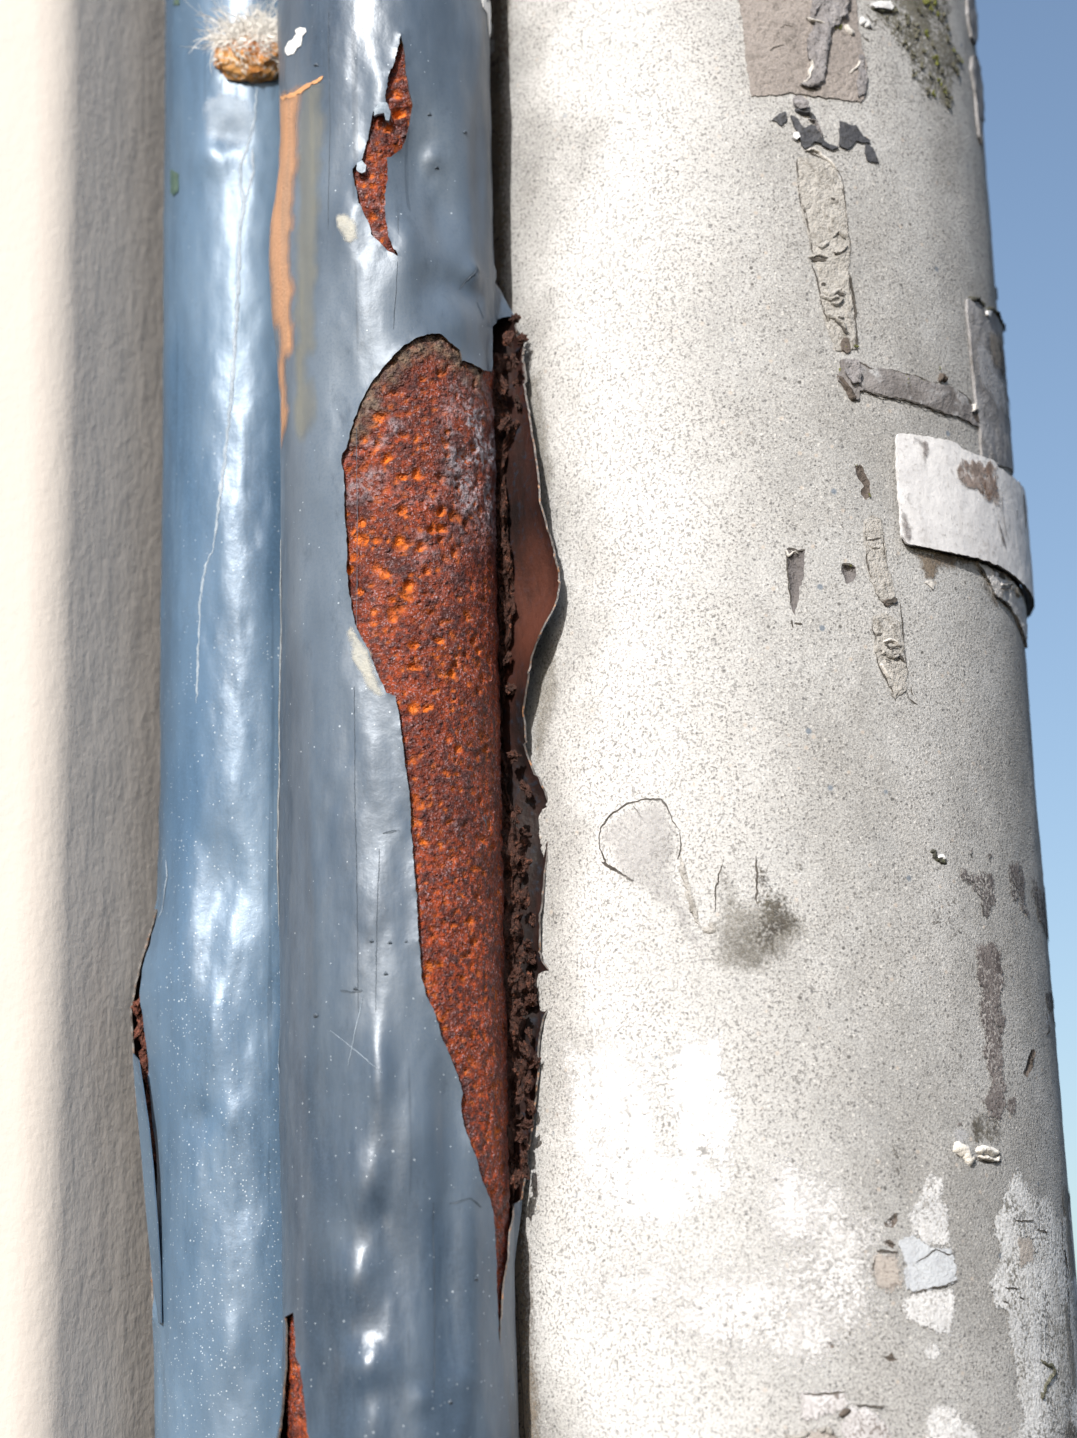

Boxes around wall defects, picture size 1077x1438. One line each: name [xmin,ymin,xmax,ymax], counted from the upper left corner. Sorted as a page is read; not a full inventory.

peeling [738,0,1014,477]
rust [495,313,529,432]
peeling [975,561,1028,649]
rust [503,651,517,695]
rust [506,750,522,764]
rust [509,779,532,865]
rust [508,902,542,1190]
peeling [785,1390,892,1438]